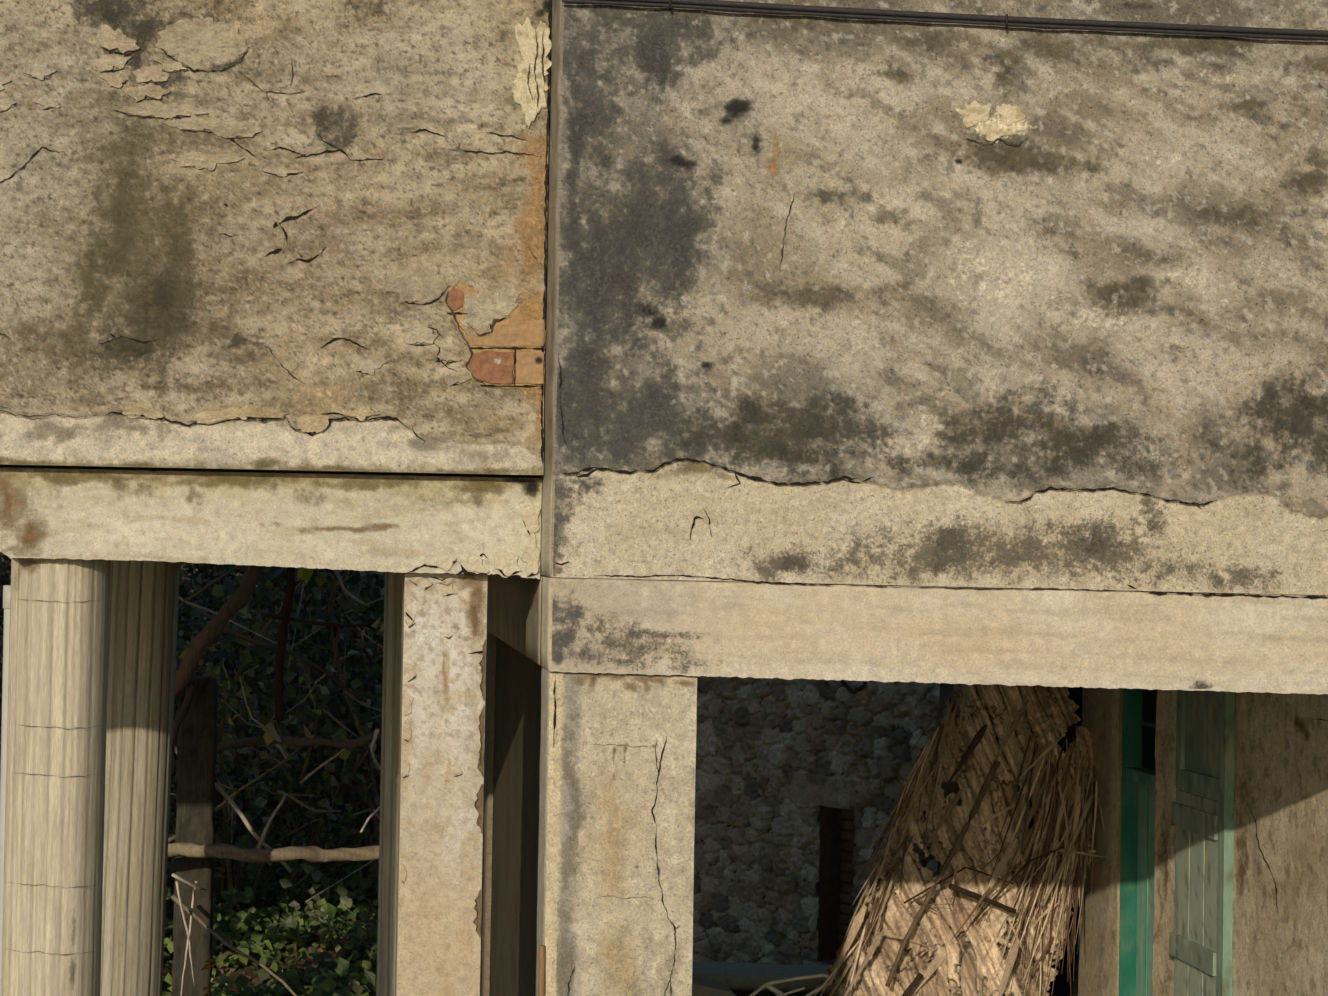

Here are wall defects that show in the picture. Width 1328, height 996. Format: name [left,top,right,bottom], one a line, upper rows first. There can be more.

peeling [95,17,263,171]
peeling [512,0,552,129]
peeling [956,100,1031,146]
spalling [385,256,546,391]
crack [209,0,872,487]
damp [553,0,1163,576]
crack [0,406,198,427]
damp [1203,364,1328,485]
crack [690,508,712,538]
damp [744,491,1282,592]
damp [552,600,705,727]
crack [589,738,680,996]